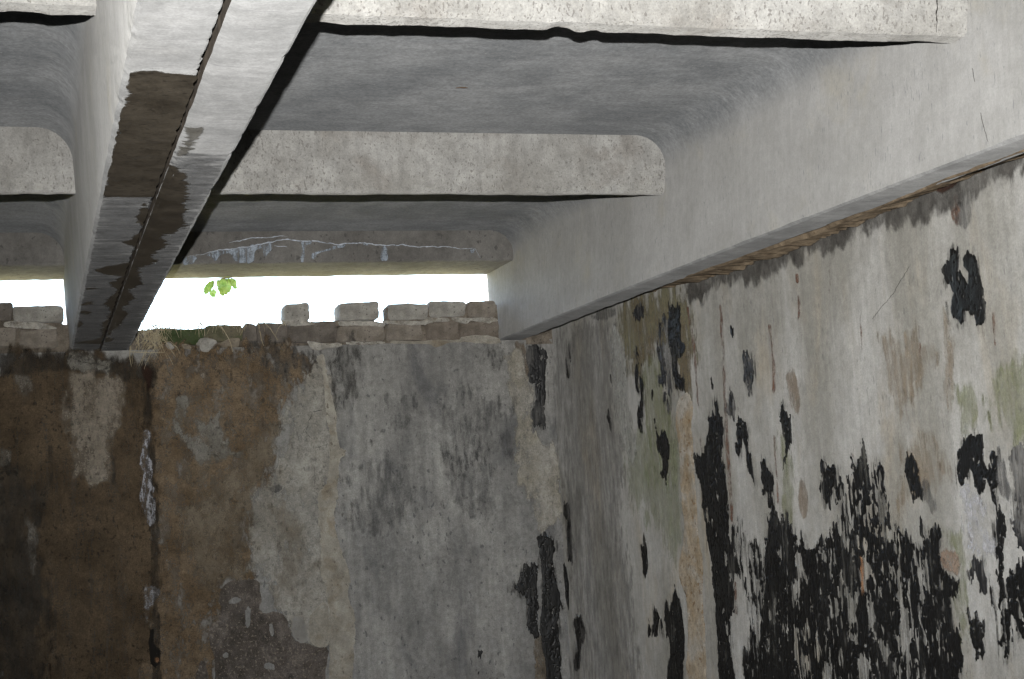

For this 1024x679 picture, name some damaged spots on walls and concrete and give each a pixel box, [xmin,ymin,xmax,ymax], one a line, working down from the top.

crack [141,364,161,679]
leakage [0,71,366,679]
peeling [526,344,548,430]
peeling [511,501,586,679]
peeling [632,301,1024,679]
peeling [941,245,986,327]